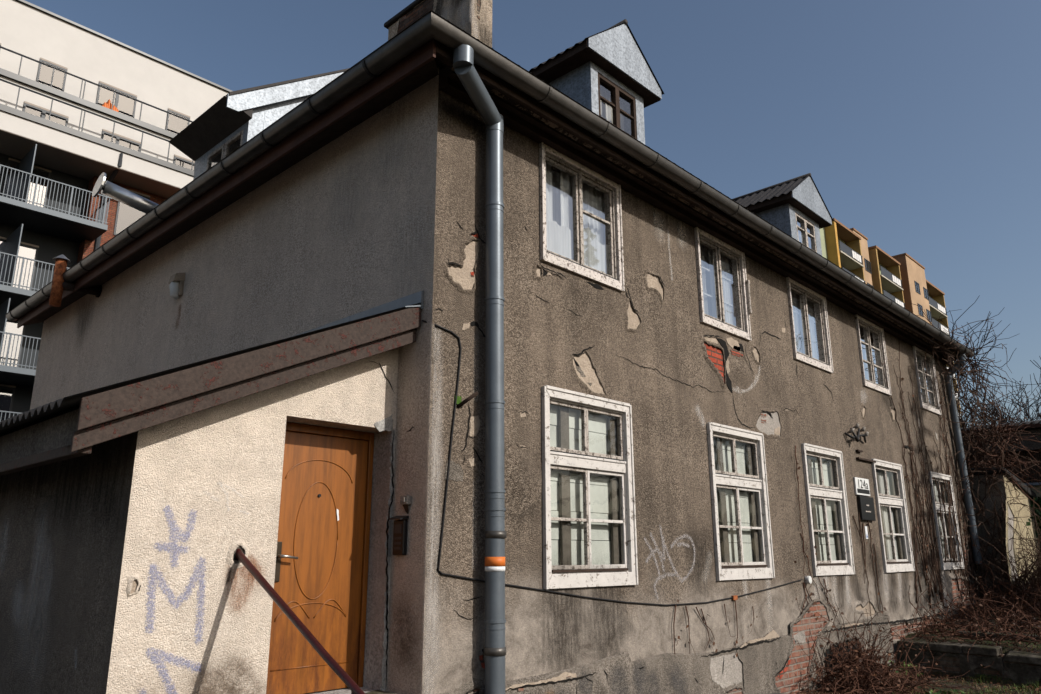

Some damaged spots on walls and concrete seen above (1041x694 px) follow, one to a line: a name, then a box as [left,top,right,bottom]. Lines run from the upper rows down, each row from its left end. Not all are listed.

flaking render [443,232,482,295]
flaking render [624,288,642,333]
flaking render [644,269,665,305]
flaking render [569,345,608,398]
flaking render [700,335,761,393]
flaking render [753,408,782,440]
flaking render [440,649,485,694]
flaking render [710,653,745,694]
crack [695,630,781,687]
flaking render [772,598,866,694]